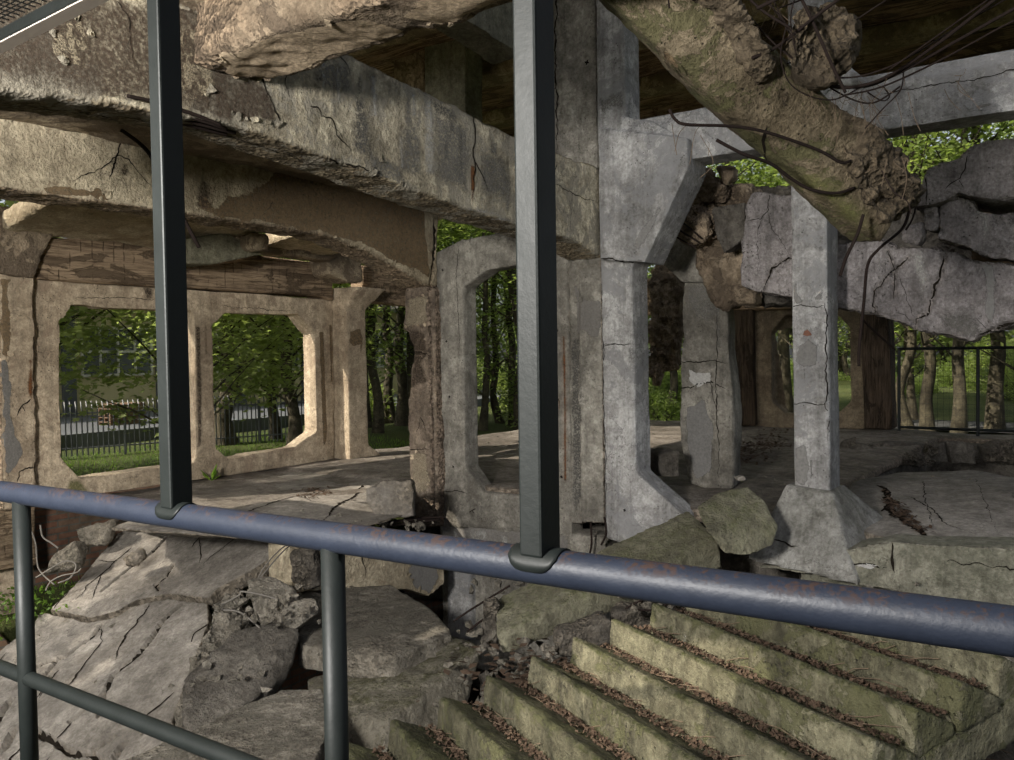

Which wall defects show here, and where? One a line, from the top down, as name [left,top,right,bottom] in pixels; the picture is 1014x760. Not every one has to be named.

spalling [404,0,501,27]
spalling [180,19,404,136]
spalling [748,0,1014,129]
crack [74,143,149,184]
crack [218,76,386,178]
spalling [668,109,851,164]
spalling [716,139,855,195]
crack [748,195,792,288]
crack [872,250,944,328]
crack [854,483,962,573]
crack [37,546,174,697]
crack [8,723,99,760]